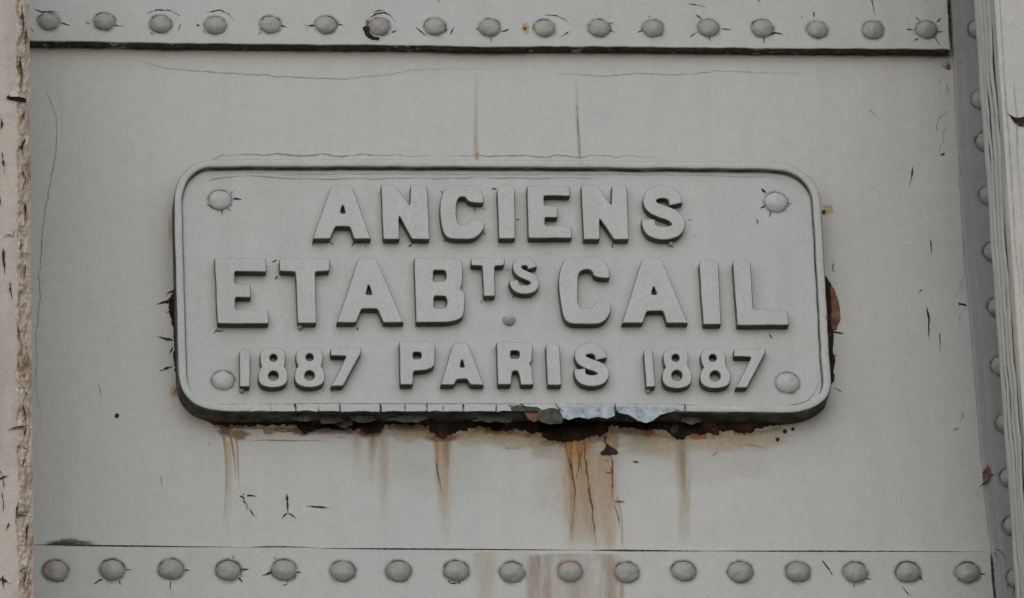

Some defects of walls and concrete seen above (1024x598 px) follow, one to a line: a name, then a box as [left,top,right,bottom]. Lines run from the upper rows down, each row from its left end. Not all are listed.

peeling [6,0,34,598]
rust [219,426,309,474]
peeling [205,404,794,455]
rust [361,425,771,546]